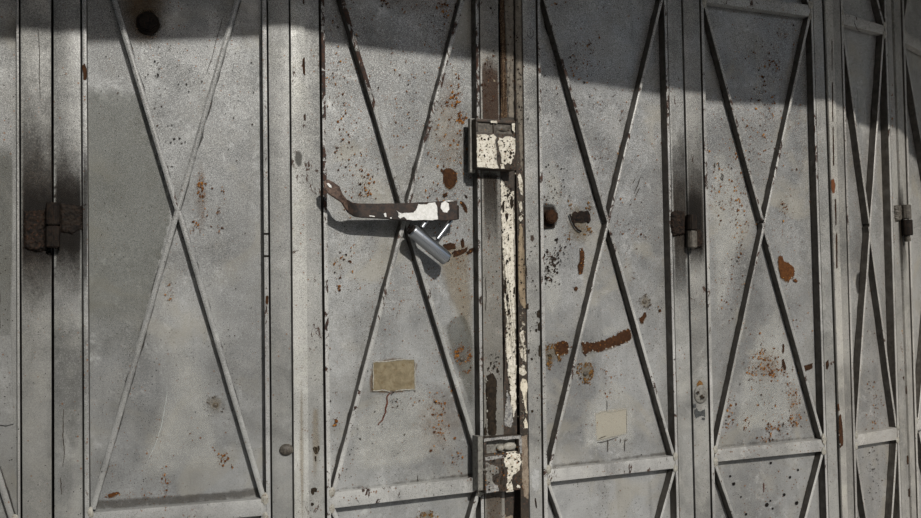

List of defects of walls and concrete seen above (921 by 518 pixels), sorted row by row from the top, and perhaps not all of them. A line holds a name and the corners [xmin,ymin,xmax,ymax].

corrosion [326,20,394,202]
corrosion [347,372,467,474]
corrosion [355,0,474,322]
corrosion [475,0,516,120]
peeling [484,0,541,508]
corrosion [534,164,597,276]
corrosion [527,272,644,423]
corrosion [711,11,802,338]
corrosion [722,241,813,442]